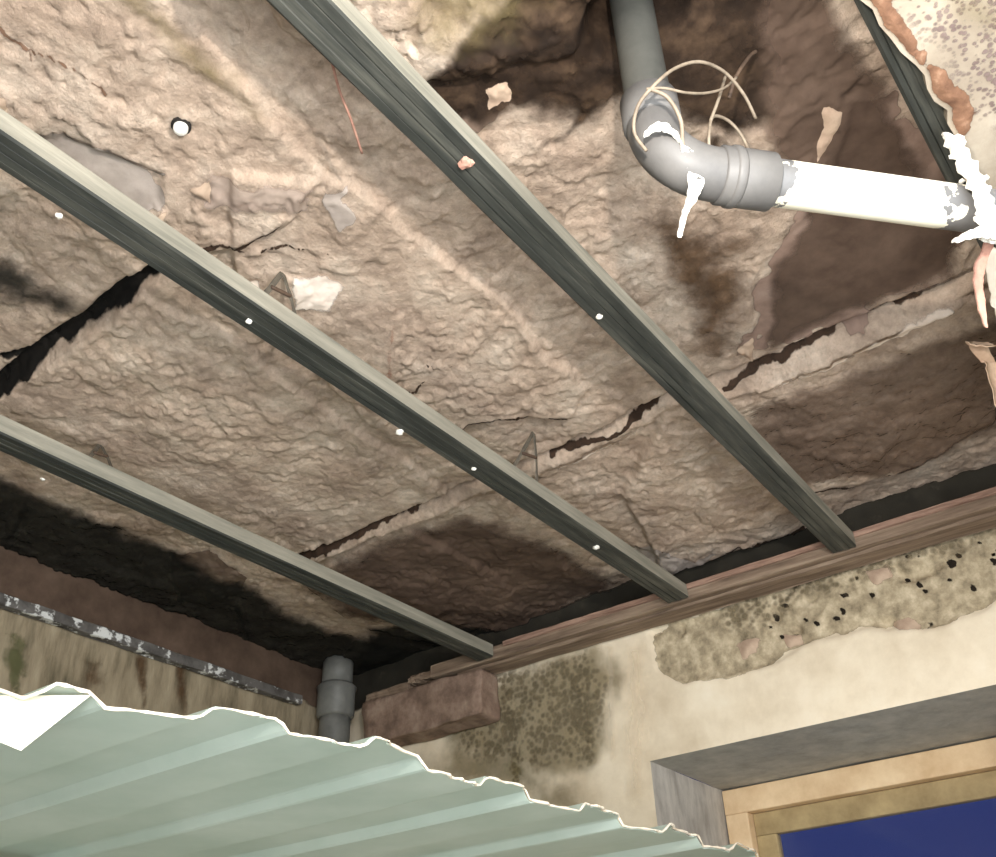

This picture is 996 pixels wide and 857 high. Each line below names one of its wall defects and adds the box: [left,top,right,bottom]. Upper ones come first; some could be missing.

leakage [913,0,996,116]
crack [0,265,159,398]
crack [462,396,660,459]
crack [722,324,836,392]
crack [880,283,938,306]
peeling [965,341,996,406]
leakage [0,478,463,711]
leakage [336,519,653,646]
leakage [673,528,820,584]
spalling [653,527,996,684]
leakage [837,464,996,532]
leakage [457,657,601,781]